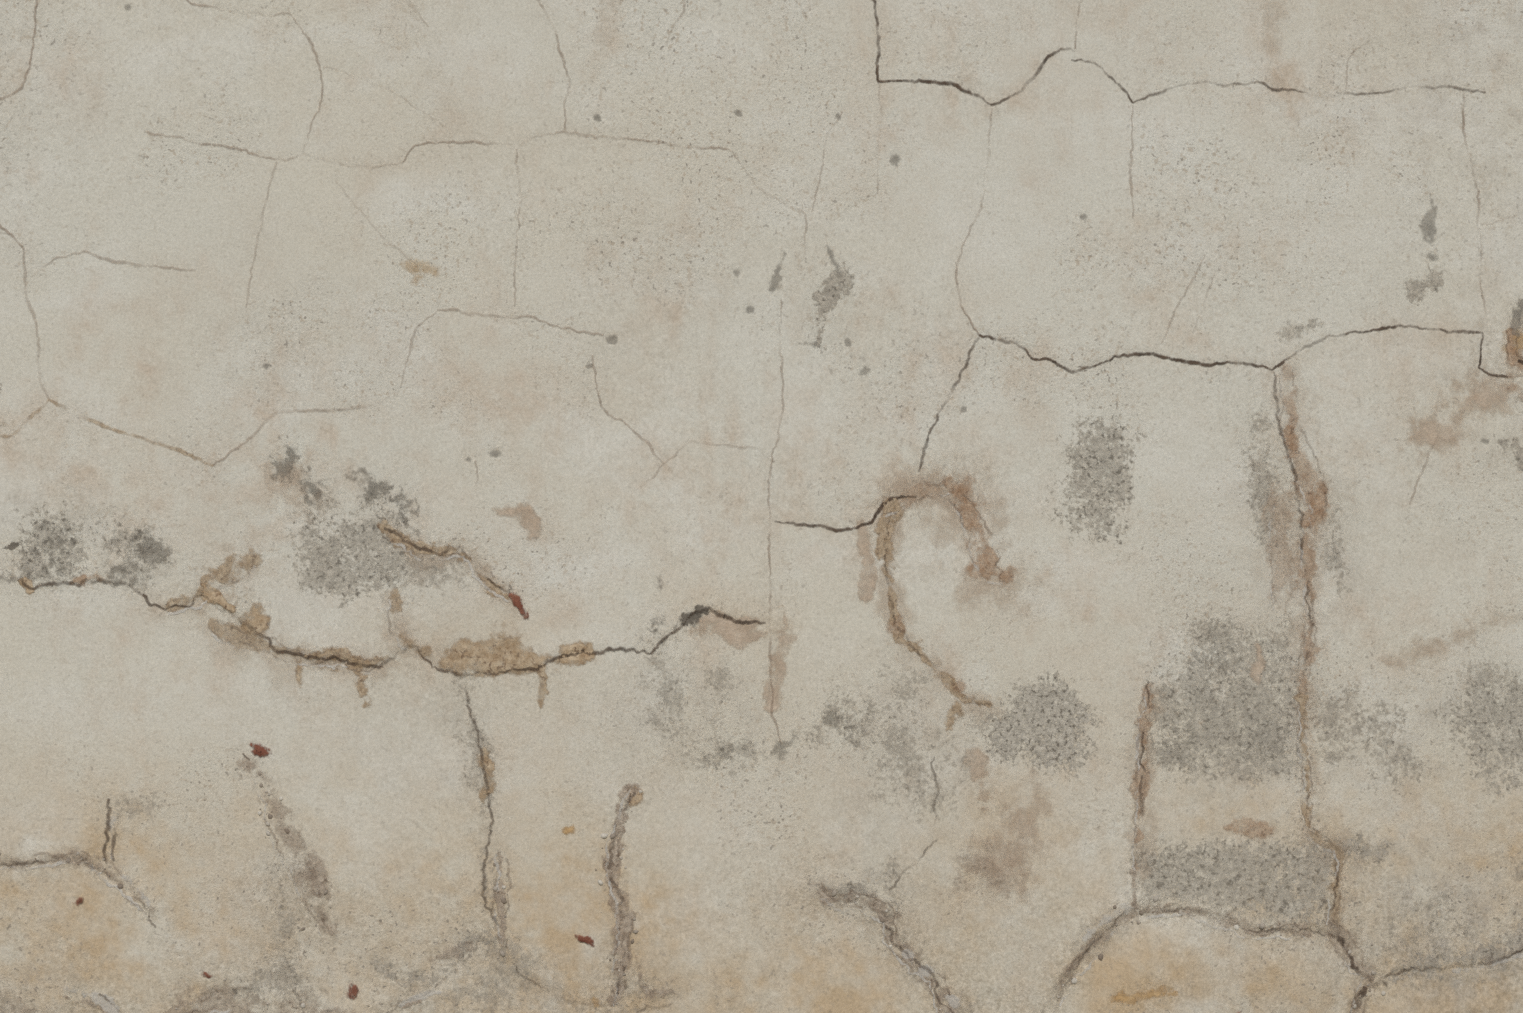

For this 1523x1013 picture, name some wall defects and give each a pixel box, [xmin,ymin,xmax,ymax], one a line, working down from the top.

crack [873,0,1009,106]
crack [1037,48,1159,103]
crack [959,317,1287,376]
crack [1345,325,1508,377]
crack [176,448,213,466]
crack [1498,437,1523,471]
corrosion [945,478,1013,584]
crack [1247,413,1326,610]
crack [777,416,992,809]
crack [0,501,796,1013]
crack [1055,694,1523,1013]
crack [818,858,958,1013]